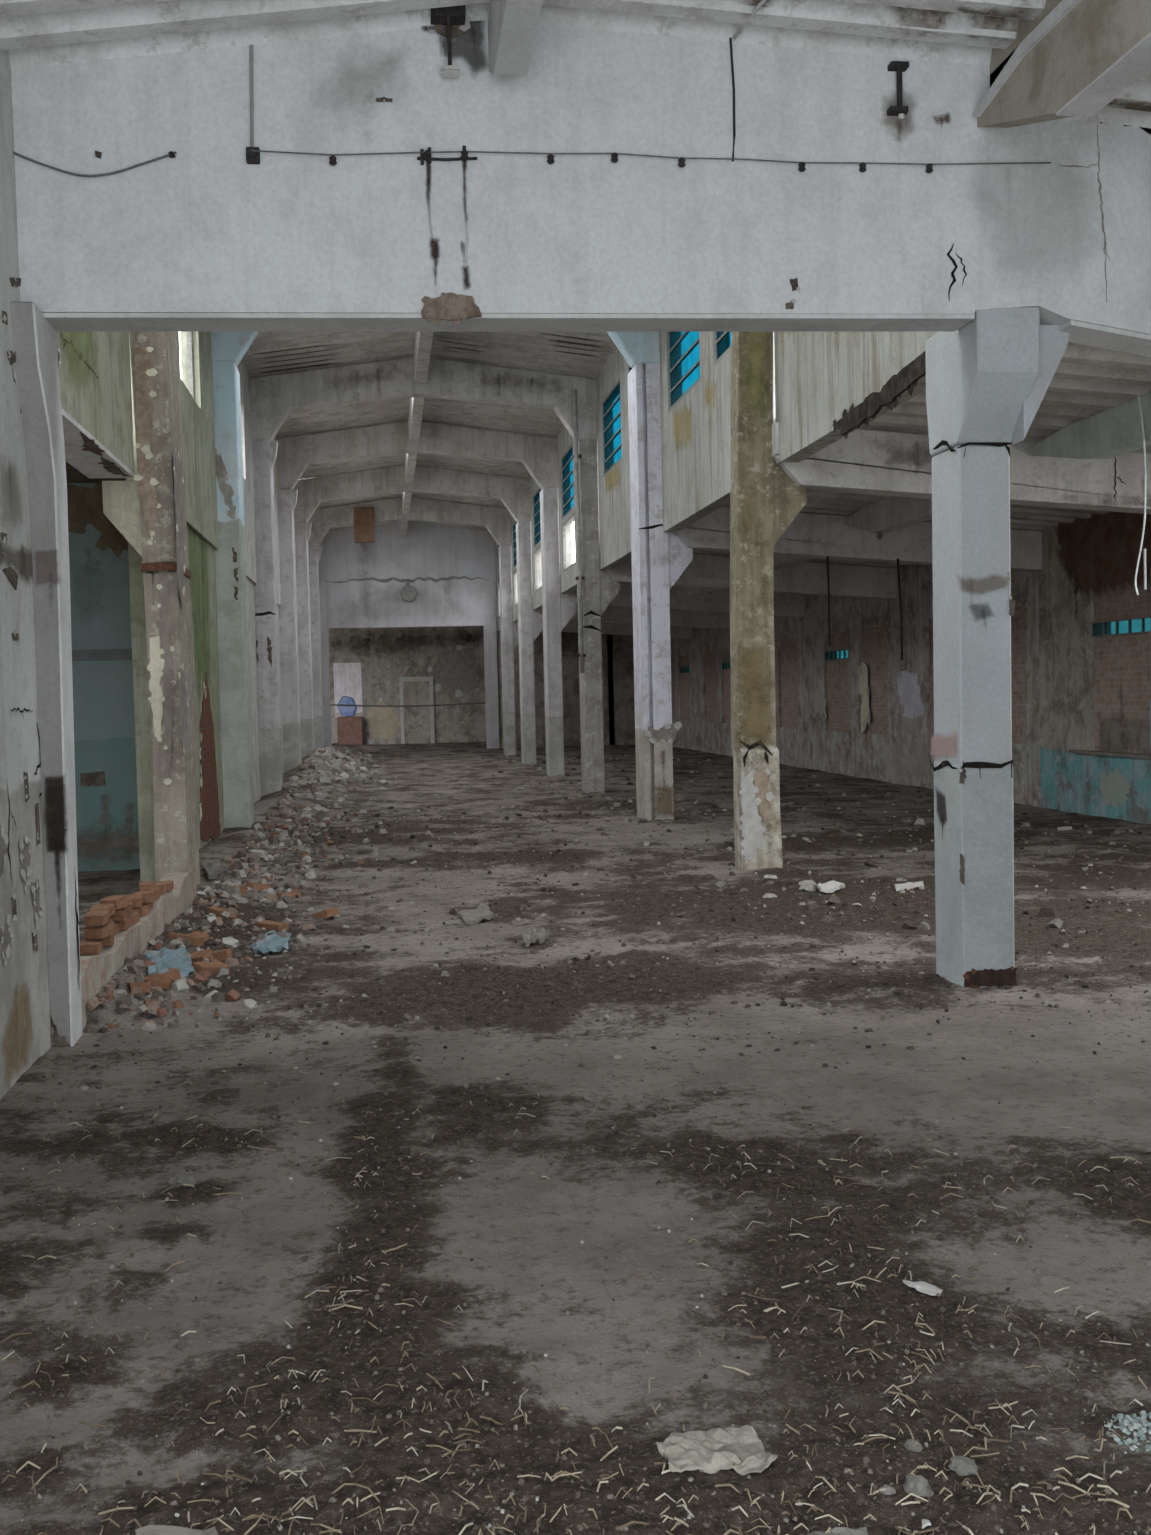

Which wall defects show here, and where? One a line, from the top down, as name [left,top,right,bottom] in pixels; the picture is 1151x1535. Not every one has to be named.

leakage [899,7,1023,30]
crack [947,243,967,301]
spalling [421,292,482,325]
spalling [833,351,926,439]
spalling [3,565,20,590]
crack [739,740,773,768]
crack [930,760,1014,779]
peeling [0,772,43,966]